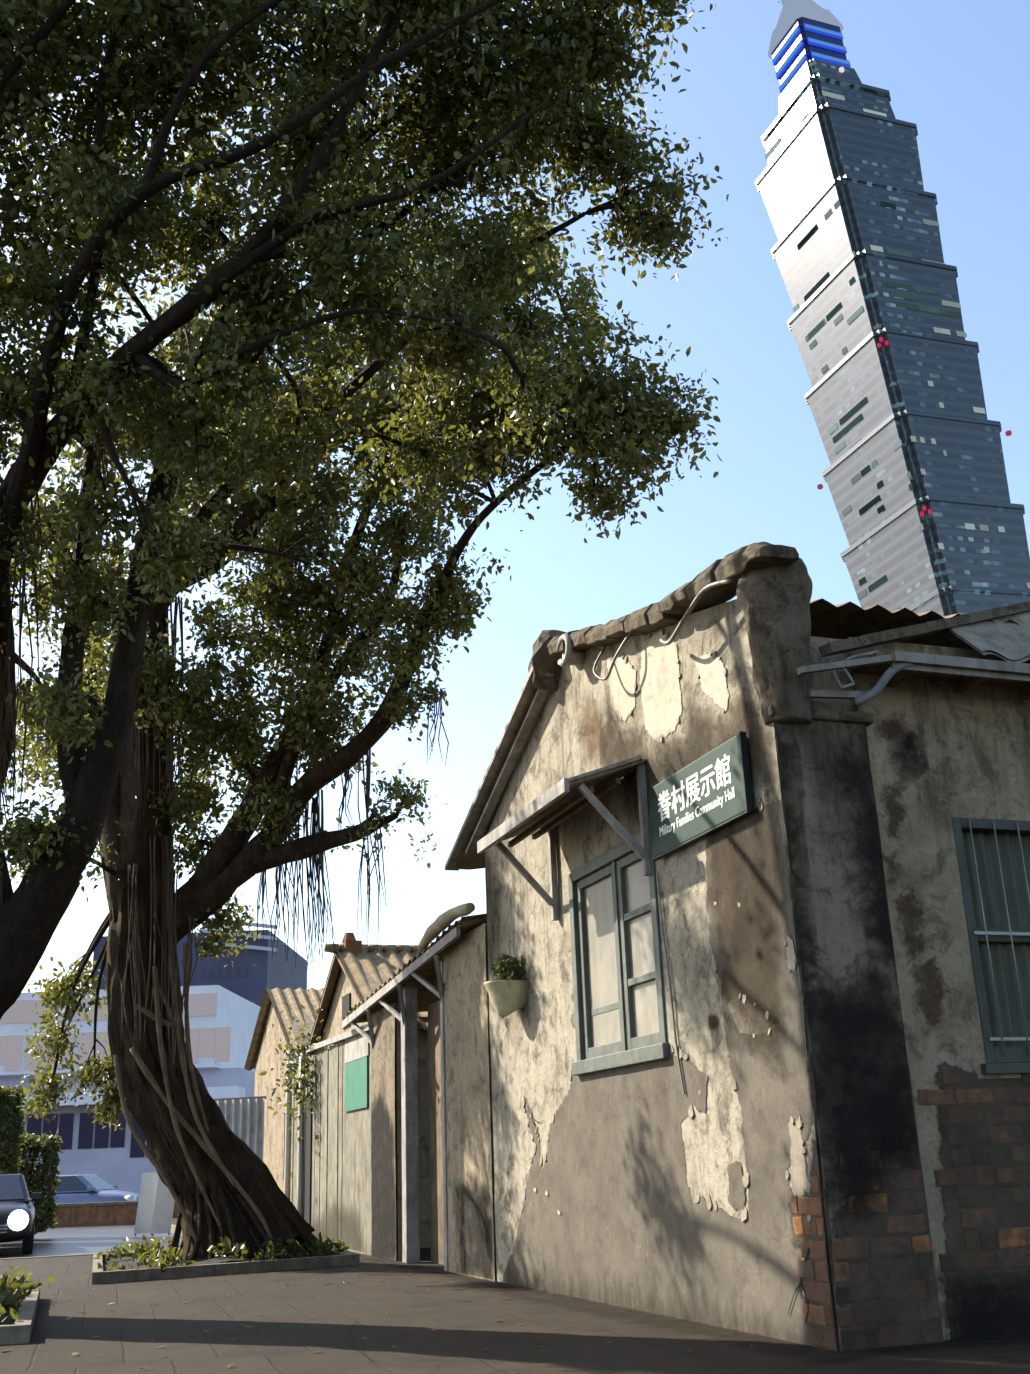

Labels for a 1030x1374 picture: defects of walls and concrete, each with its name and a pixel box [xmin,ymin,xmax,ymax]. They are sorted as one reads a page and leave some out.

flaking render [607,628,729,743]
leakage [455,1177,699,1321]
leakage [602,697,917,1213]
flaking render [502,783,1030,1351]